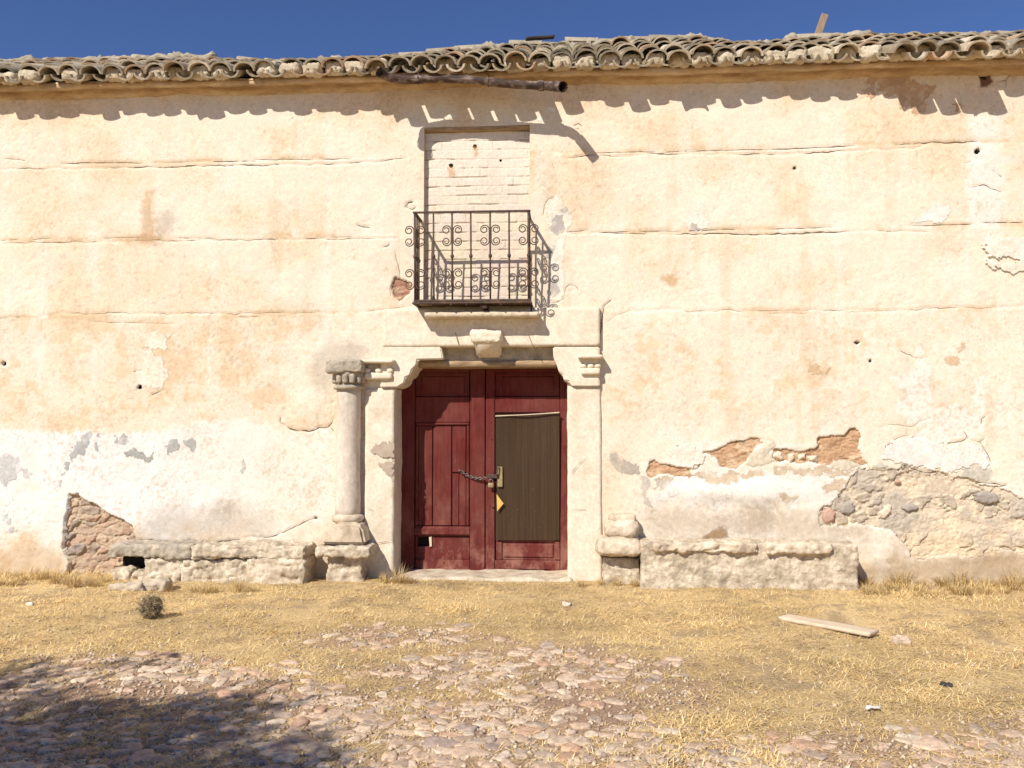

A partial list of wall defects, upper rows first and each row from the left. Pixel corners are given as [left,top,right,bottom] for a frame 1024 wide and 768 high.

crack [6,158,400,169]
peeling [545,193,573,304]
crack [570,227,844,235]
crack [878,222,1023,232]
peeling [981,233,1024,275]
spalling [392,277,412,301]
peeling [58,431,101,488]
peeling [114,433,153,463]
peeling [165,438,196,456]
peeling [370,441,395,482]
spalling [609,429,1024,561]
spalling [64,493,136,574]